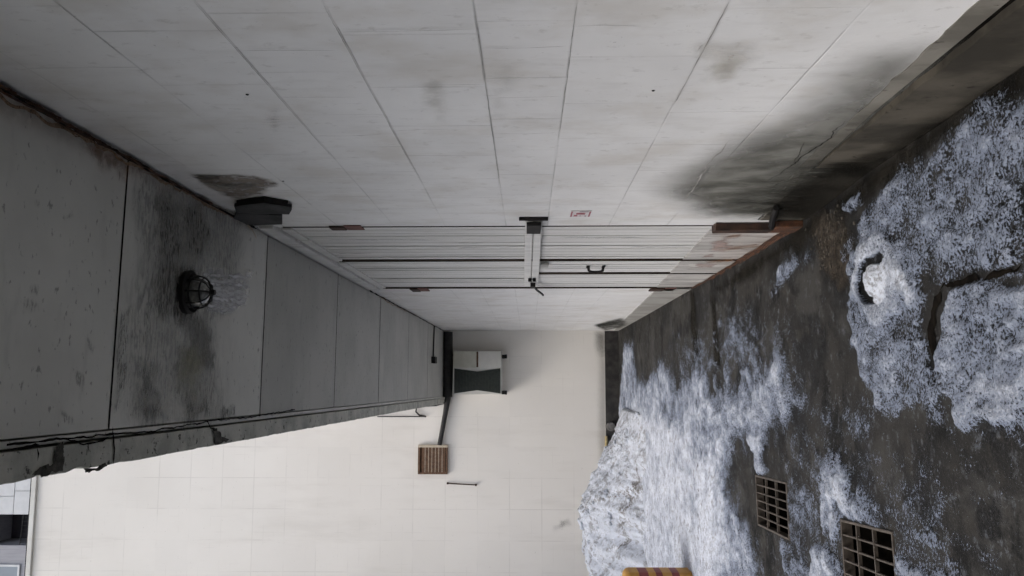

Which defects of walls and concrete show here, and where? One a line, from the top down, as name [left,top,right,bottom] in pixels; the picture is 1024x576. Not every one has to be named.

water stain [681,62,1022,366]
water stain [116,196,250,418]
spalling [32,442,65,477]
crack [7,409,295,464]
spalling [205,420,229,445]